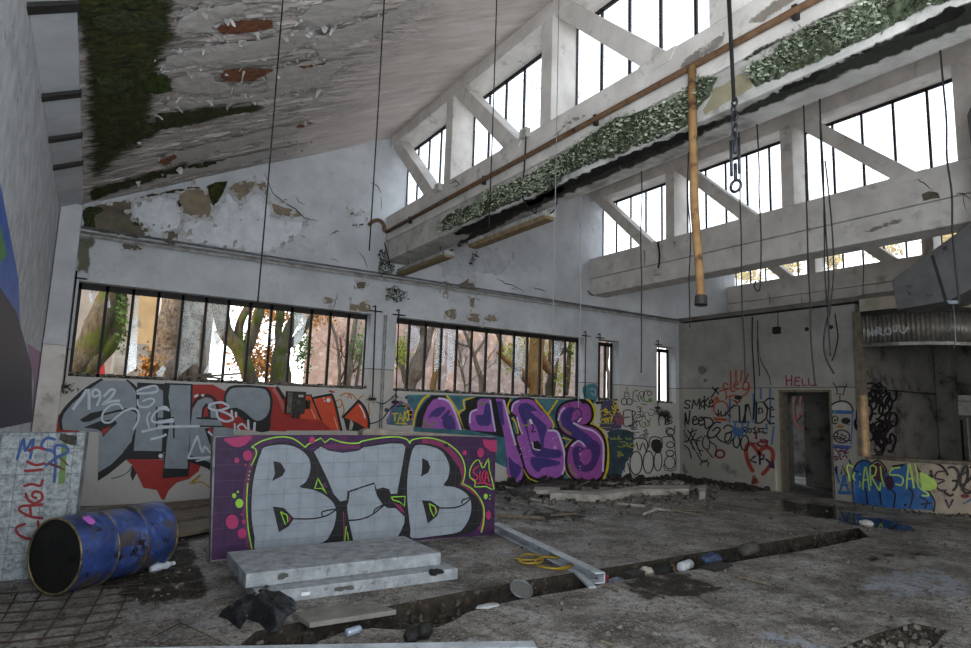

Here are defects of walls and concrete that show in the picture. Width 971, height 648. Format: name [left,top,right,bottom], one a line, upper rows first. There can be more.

peeling [152,0,433,120]
peeling [81,198,151,252]
peeling [163,227,181,246]
peeling [348,279,374,314]
peeling [437,279,499,328]